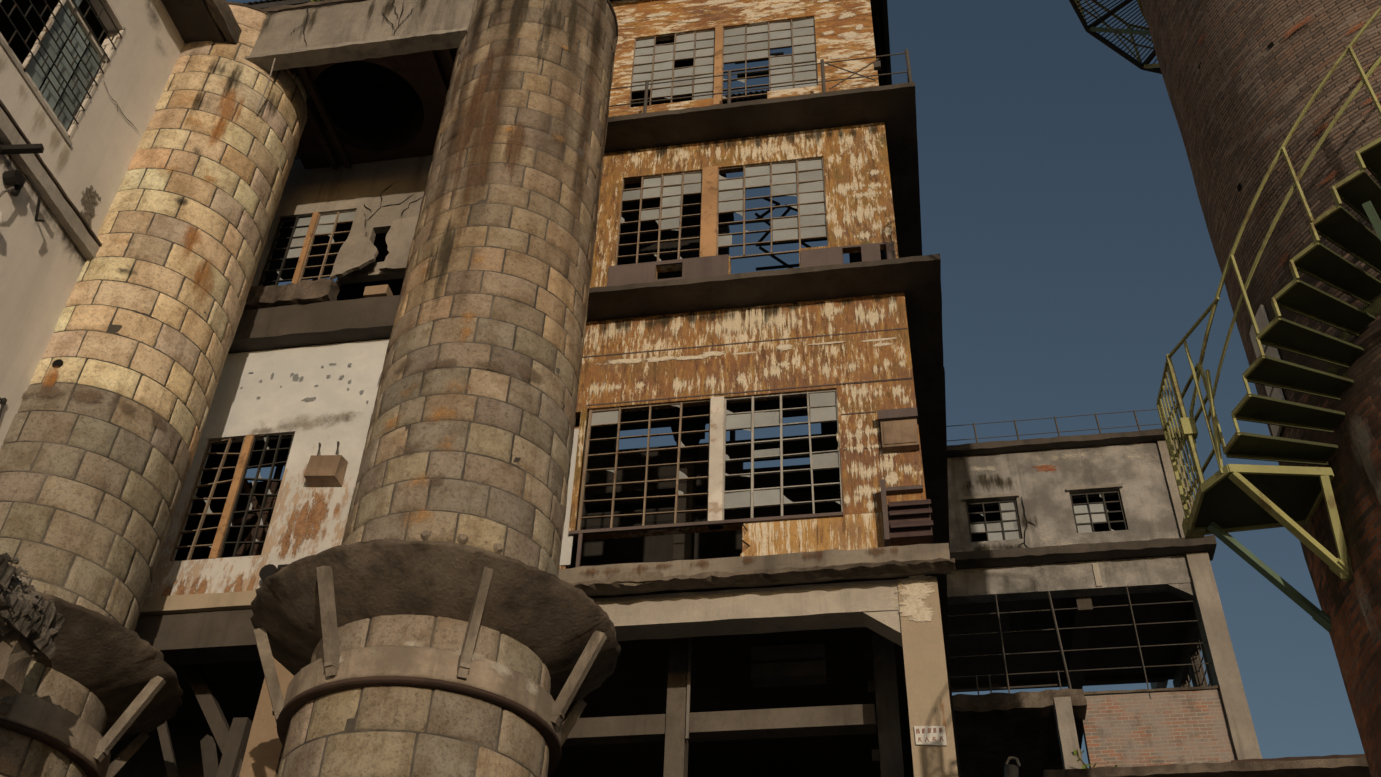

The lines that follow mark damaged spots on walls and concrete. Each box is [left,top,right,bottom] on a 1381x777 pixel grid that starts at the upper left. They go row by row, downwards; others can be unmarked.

peeling [618,0,793,23]
peeling [818,0,866,85]
peeling [630,150,689,169]
peeling [706,138,823,160]
crack [364,182,422,219]
peeling [826,134,891,241]
peeling [587,296,909,404]
peeling [837,425,913,513]
corrosion [278,490,339,559]
corrosion [161,576,207,596]
corrosion [224,574,263,593]